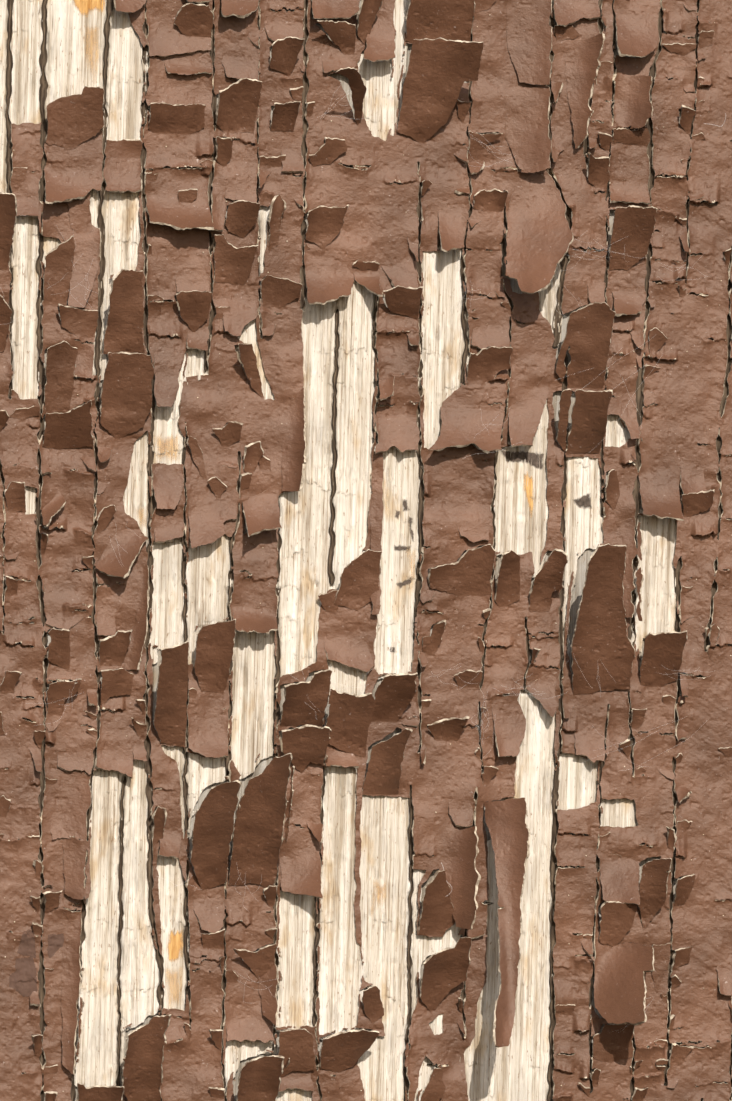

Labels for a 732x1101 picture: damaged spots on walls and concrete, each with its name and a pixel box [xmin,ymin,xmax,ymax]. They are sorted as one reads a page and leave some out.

peeling [0,341,112,472]
crack [0,0,114,1101]
peeling [0,0,213,399]
crack [116,0,217,1086]
peeling [200,18,306,171]
peeling [40,163,715,1101]
peeling [311,0,496,144]
crack [460,81,497,384]
peeling [504,0,657,454]
crack [547,425,636,1101]
crack [583,0,699,646]
crack [664,246,732,1100]